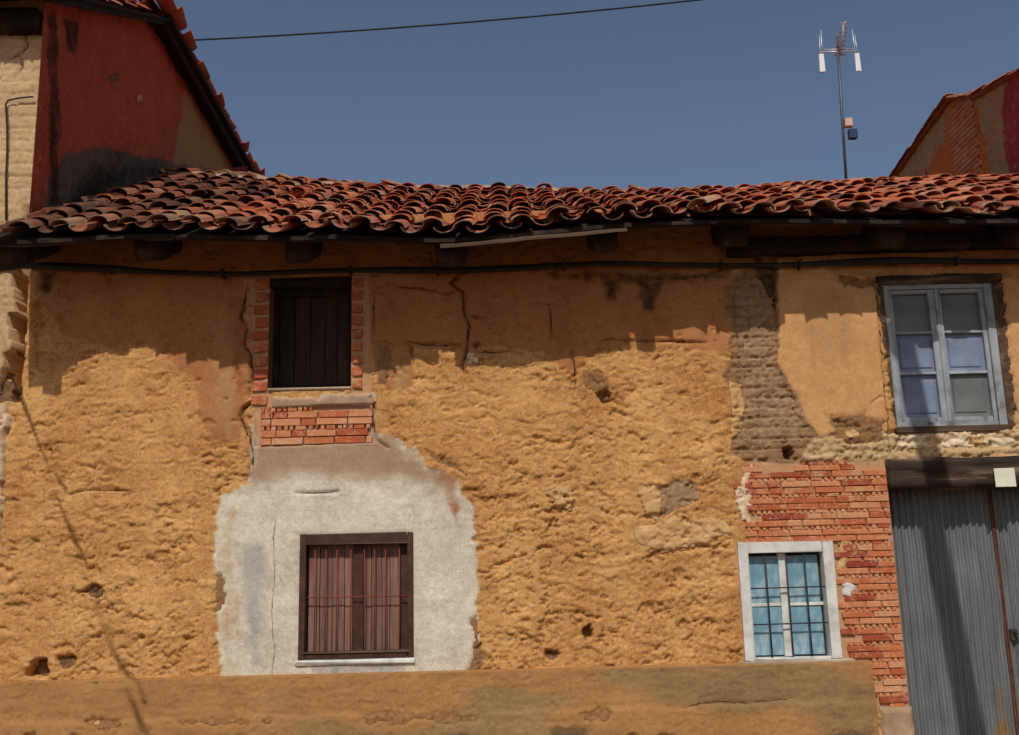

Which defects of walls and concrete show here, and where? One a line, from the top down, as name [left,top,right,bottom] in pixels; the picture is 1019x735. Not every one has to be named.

flaking render [0,367,23,403]
crack [240,288,254,465]
crack [373,278,503,371]
crack [607,336,701,344]
flaking render [729,278,814,448]
flaking render [830,275,1017,450]
flaking render [633,480,734,554]
flaking render [735,465,752,528]
crack [271,520,284,670]
flaking render [469,615,486,670]